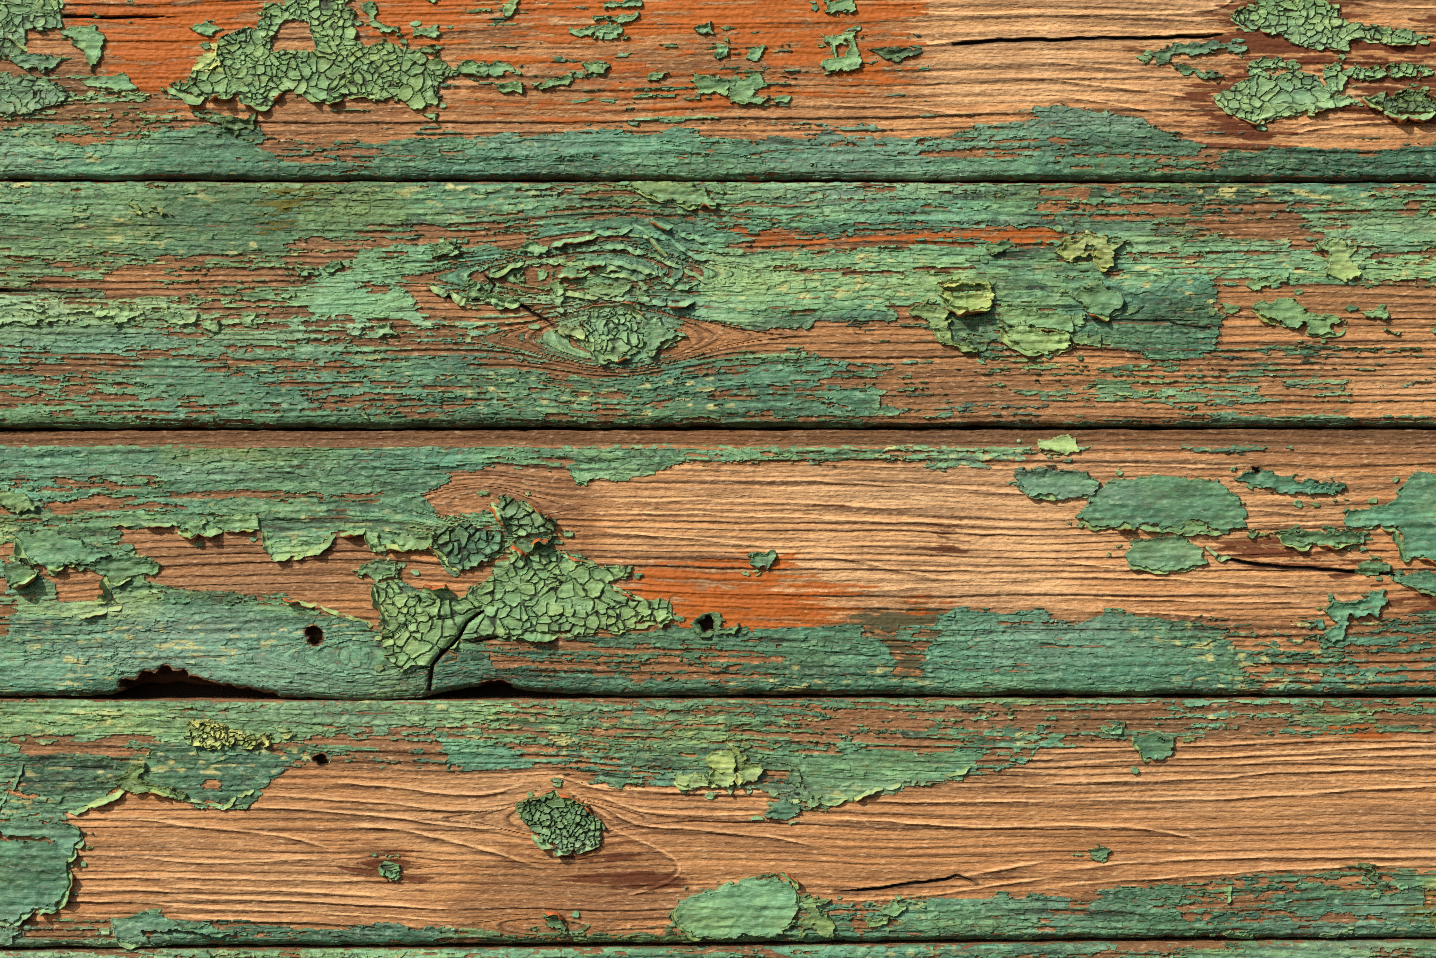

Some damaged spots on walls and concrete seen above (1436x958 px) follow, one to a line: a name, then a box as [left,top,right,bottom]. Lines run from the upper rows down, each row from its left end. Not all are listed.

peeling [0,0,138,116]
peeling [160,0,611,143]
peeling [1135,0,1436,131]
peeling [428,181,725,367]
peeling [908,221,1140,365]
peeling [0,486,748,673]
crack [428,611,498,690]
peeling [1007,434,1436,659]
peeling [0,751,254,946]
peeling [515,778,607,857]
peeling [665,872,843,942]
crack [841,874,974,891]